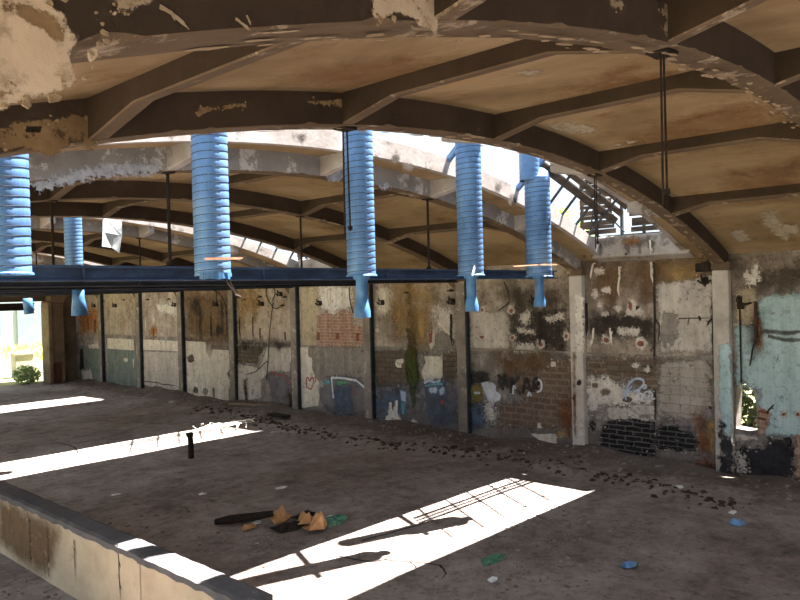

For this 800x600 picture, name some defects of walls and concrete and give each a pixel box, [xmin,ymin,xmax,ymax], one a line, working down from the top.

peeling [0,0,111,111]
spalling [245,30,349,46]
peeling [360,0,461,42]
spalling [503,30,608,53]
spalling [623,46,799,129]
peeling [0,113,98,161]
peeling [29,155,161,195]
rust [79,304,106,337]
spalling [79,286,363,408]
peeling [469,304,545,355]
peeling [481,259,800,478]